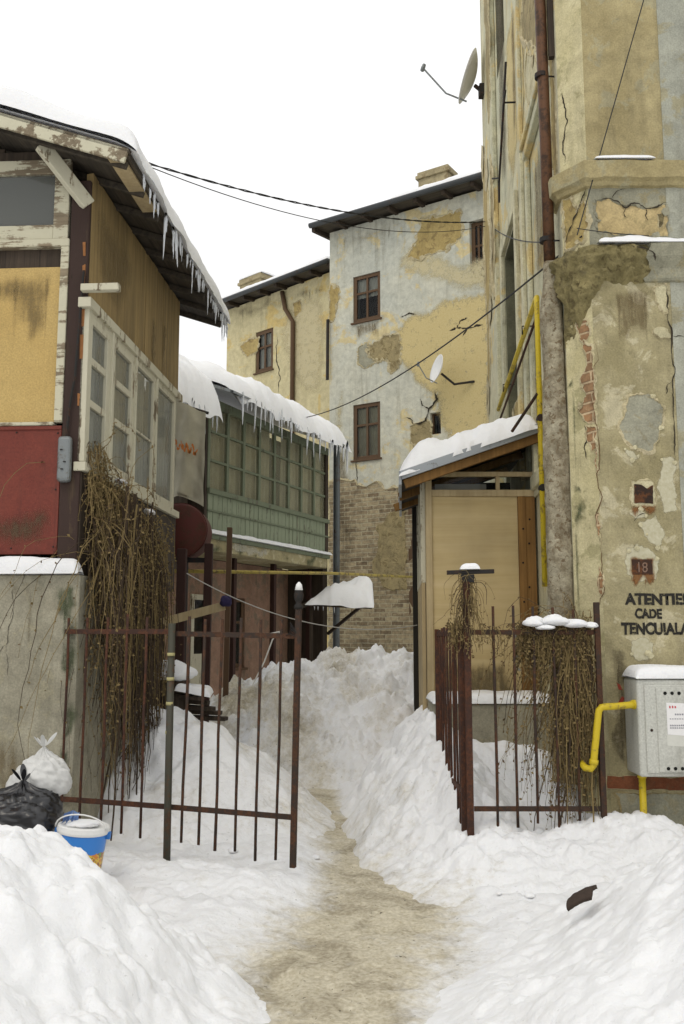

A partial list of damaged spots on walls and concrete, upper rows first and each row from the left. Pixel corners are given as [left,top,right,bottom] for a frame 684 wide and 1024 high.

crack [561,95,569,156]
peeling [357,145,495,448]
peeling [555,195,670,252]
flaking render [575,318,600,475]
flaking render [327,478,413,653]
spalling [616,392,677,582]